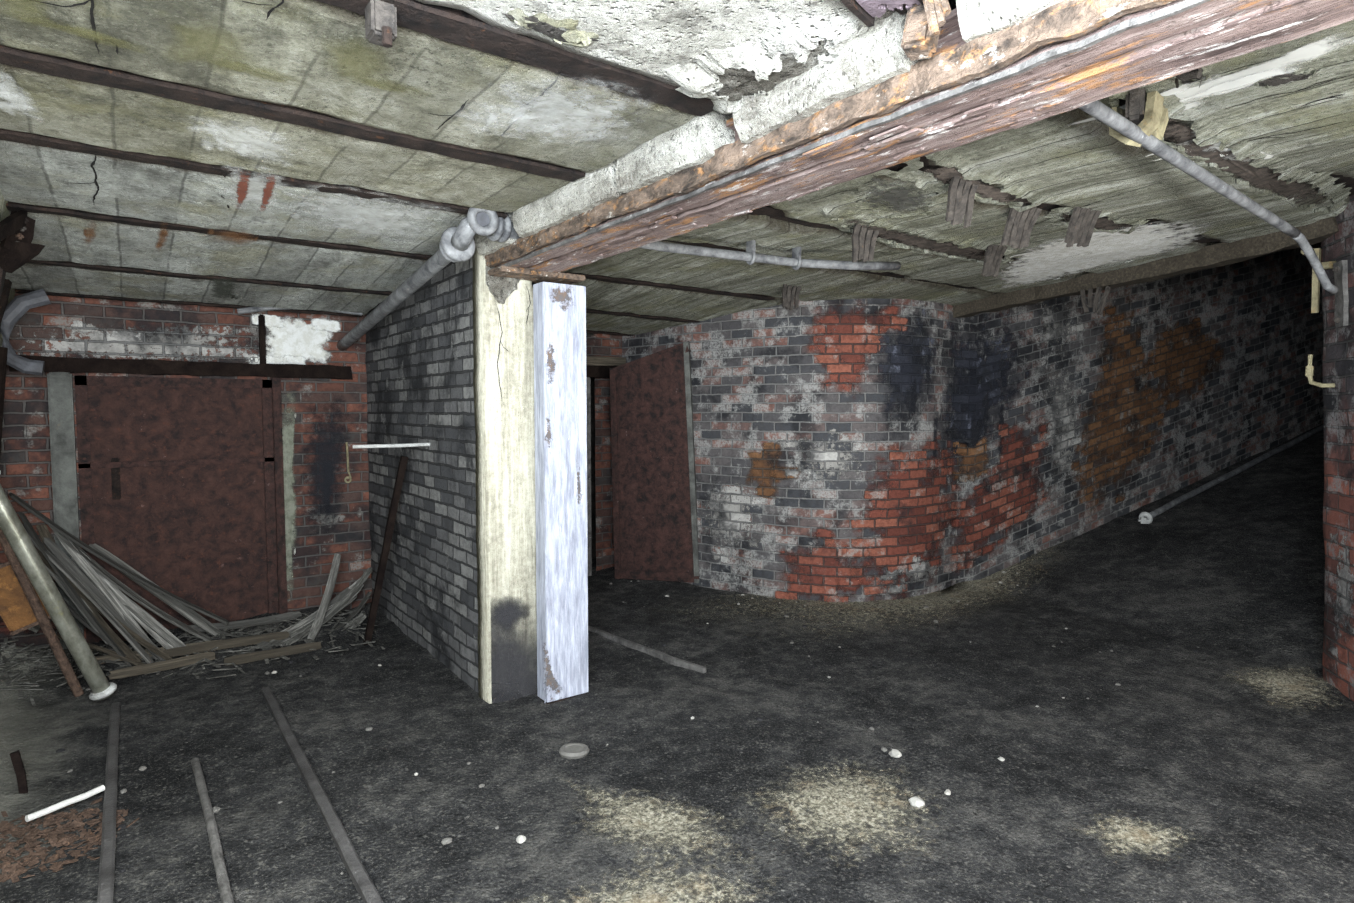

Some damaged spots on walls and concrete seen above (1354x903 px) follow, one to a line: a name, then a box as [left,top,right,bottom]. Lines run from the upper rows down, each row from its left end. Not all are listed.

crack [30,0,118,55]
spalling [665,13,866,114]
crack [76,154,99,203]
corrosion [221,173,275,210]
peeling [816,150,1074,266]
peeling [1091,210,1150,234]
peeling [864,316,908,354]
peeling [756,439,802,498]
peeling [846,546,870,558]